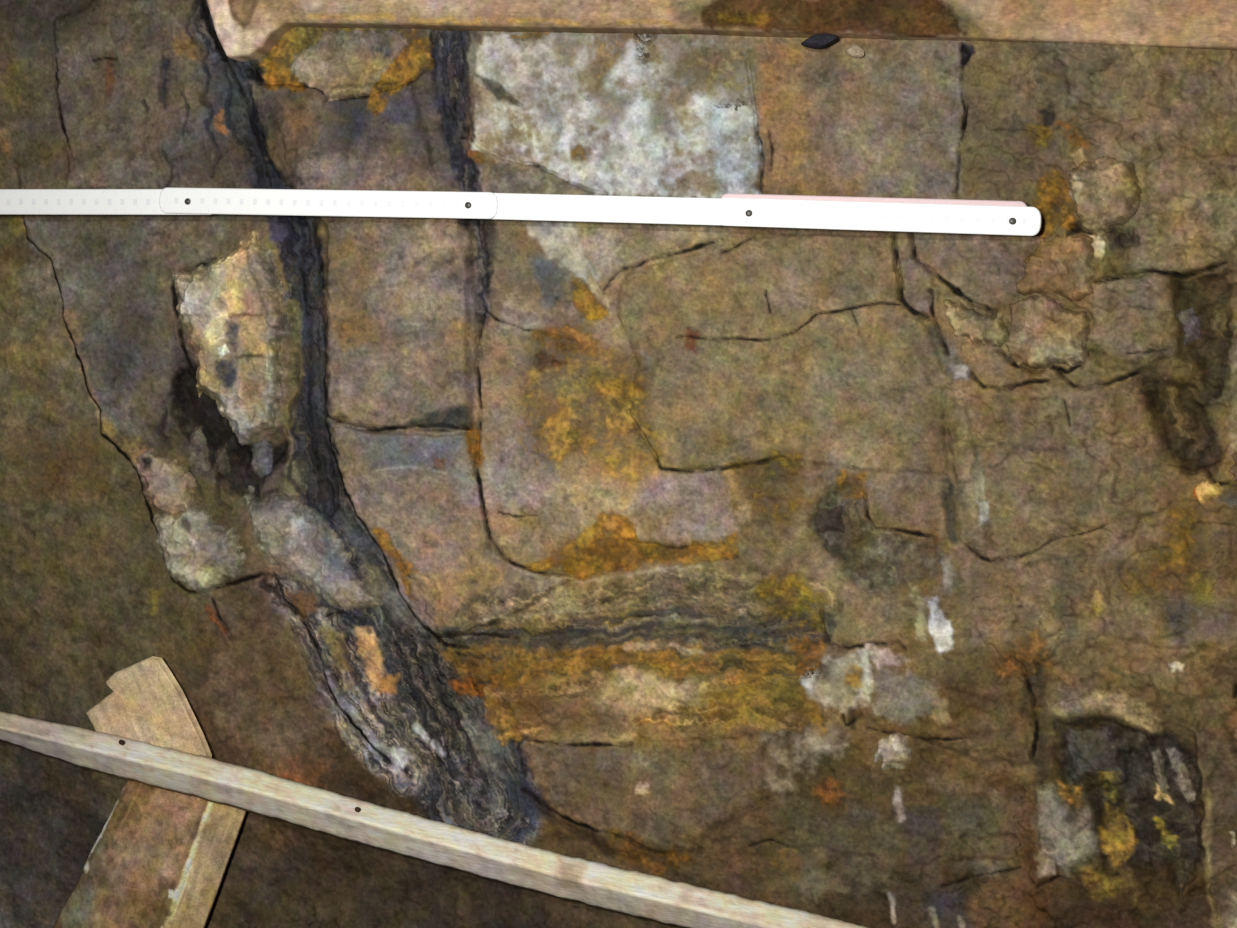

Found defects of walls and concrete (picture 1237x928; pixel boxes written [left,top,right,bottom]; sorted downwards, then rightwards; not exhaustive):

leakage [471,0,983,198]
crack [604,242,742,289]
crack [656,457,774,472]